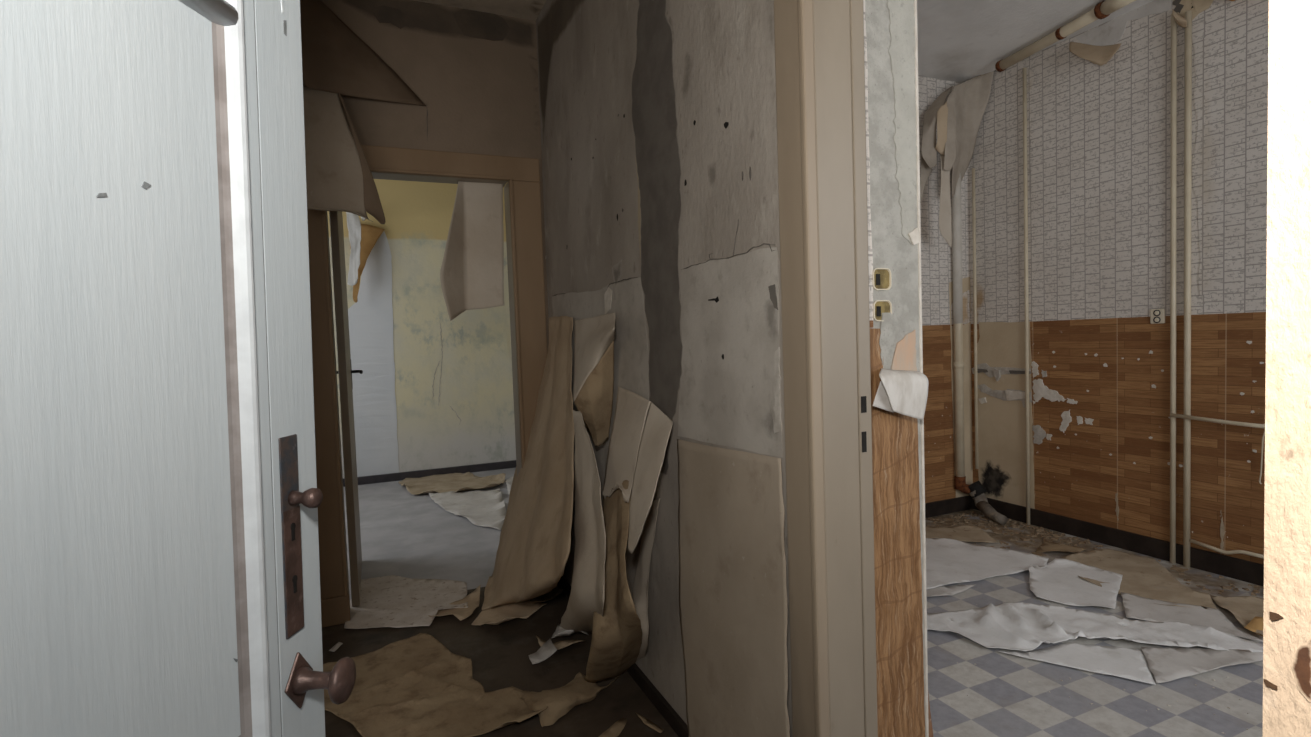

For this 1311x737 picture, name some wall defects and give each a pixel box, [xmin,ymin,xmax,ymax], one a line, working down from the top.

peeling [281,0,426,106]
peeling [1069,42,1121,66]
peeling [887,0,920,245]
flaking render [972,351,1094,449]